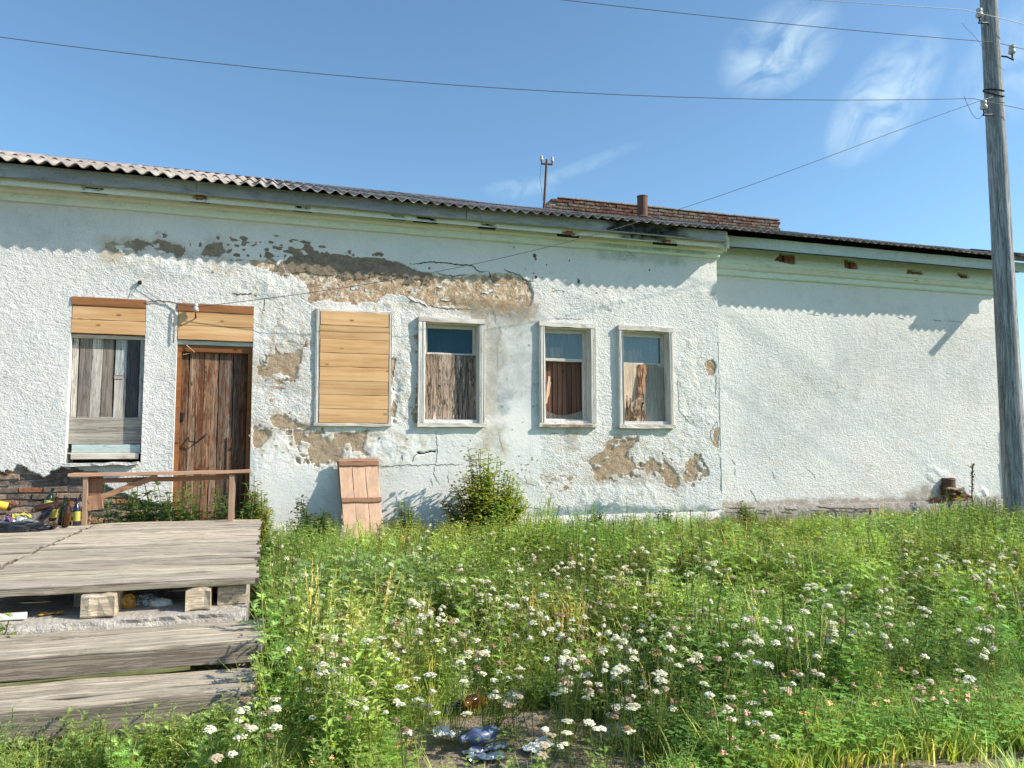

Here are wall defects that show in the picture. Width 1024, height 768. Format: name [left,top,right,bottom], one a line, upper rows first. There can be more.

flaking render [104,233,551,313]
flaking render [257,342,308,402]
flaking render [704,359,716,376]
flaking render [249,413,380,468]
flaking render [589,435,707,489]
flaking render [0,467,167,525]